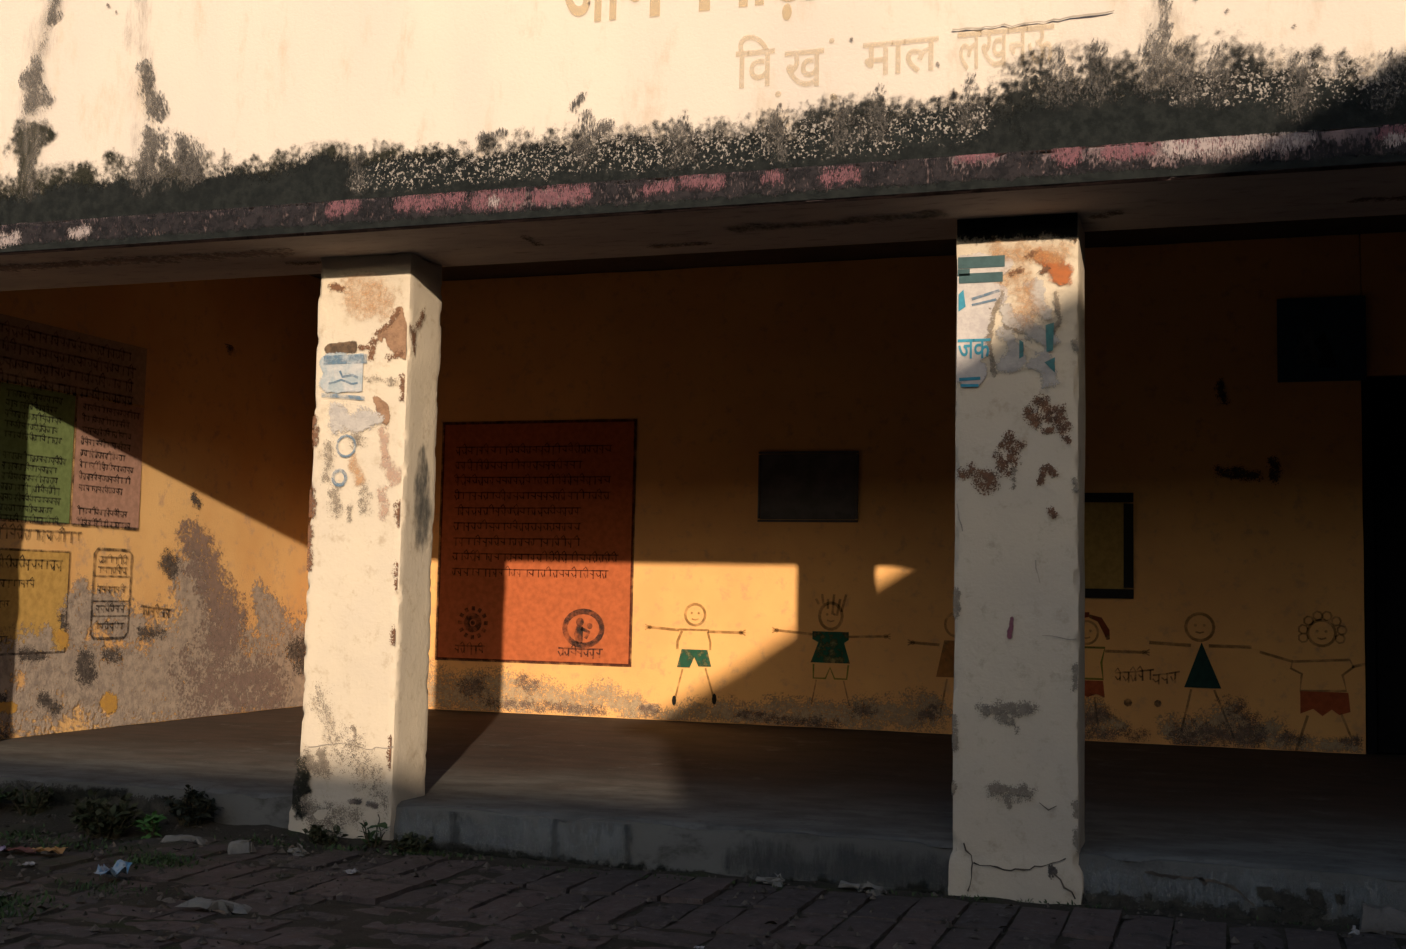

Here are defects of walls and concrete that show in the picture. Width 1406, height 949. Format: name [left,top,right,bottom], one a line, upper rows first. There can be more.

water stain [0,0,1406,272]
flaking render [307,306,426,571]
peeling [956,394,1079,496]
water stain [0,491,704,873]
crack [963,843,1076,899]